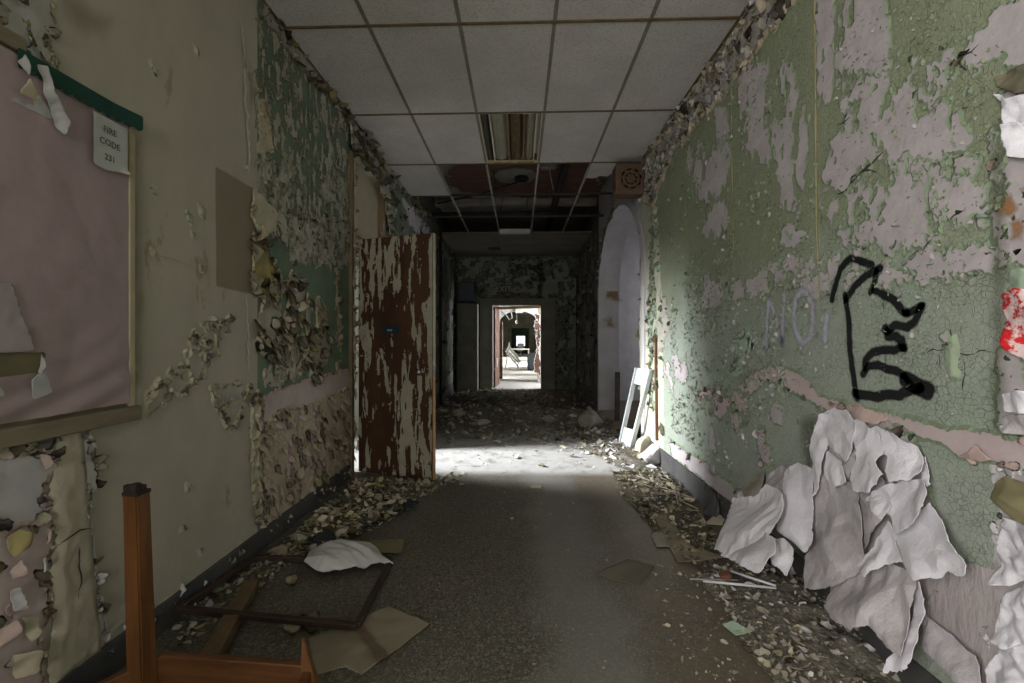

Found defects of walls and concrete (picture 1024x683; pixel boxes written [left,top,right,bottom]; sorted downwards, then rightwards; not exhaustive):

peeling [0,438,66,683]
peeling [82,430,126,656]
peeling [142,3,431,525]
peeling [611,0,1024,683]